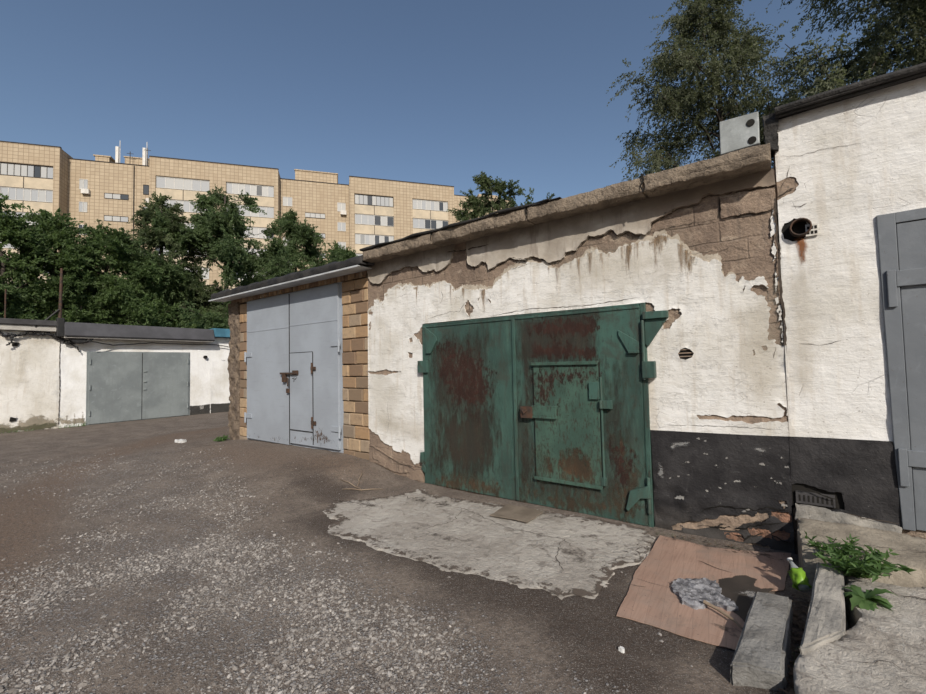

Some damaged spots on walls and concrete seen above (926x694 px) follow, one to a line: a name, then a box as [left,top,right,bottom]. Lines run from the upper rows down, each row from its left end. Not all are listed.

flaking render [367,168,799,356]
rust [797,239,807,261]
flaking render [369,429,425,480]
rust [433,339,498,420]
rust [518,313,602,411]
rust [519,384,650,523]
spalling [697,405,789,424]